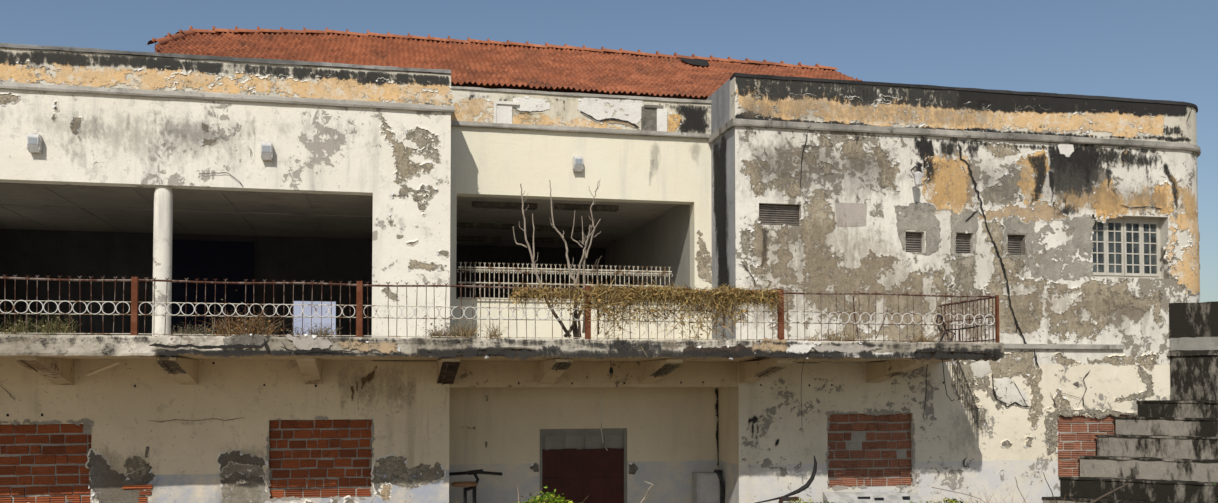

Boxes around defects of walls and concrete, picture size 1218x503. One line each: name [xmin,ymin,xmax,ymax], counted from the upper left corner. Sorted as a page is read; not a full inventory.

peeling [0,56,493,217]
peeling [511,96,643,130]
leakage [735,76,1191,215]
spalling [388,213,450,272]
leakage [646,101,730,325]
leakage [761,228,770,266]
spalling [651,85,1166,455]
crack [958,143,1090,408]
peeling [1152,180,1200,297]
spalling [85,447,156,503]
spalling [216,449,268,503]
spalling [370,454,446,501]